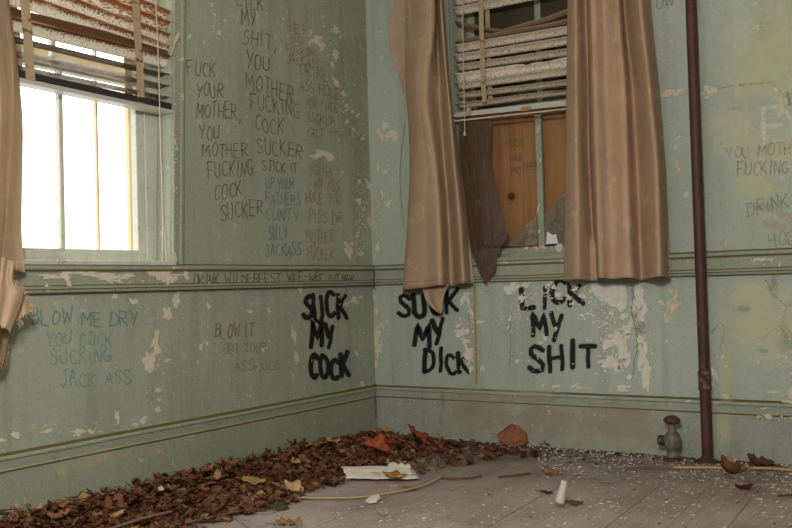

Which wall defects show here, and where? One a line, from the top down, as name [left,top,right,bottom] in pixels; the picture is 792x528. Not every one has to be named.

peeling [301,0,407,260]
peeling [40,329,175,437]
peeling [38,271,201,321]
peeling [454,290,489,373]
peeling [498,281,679,393]